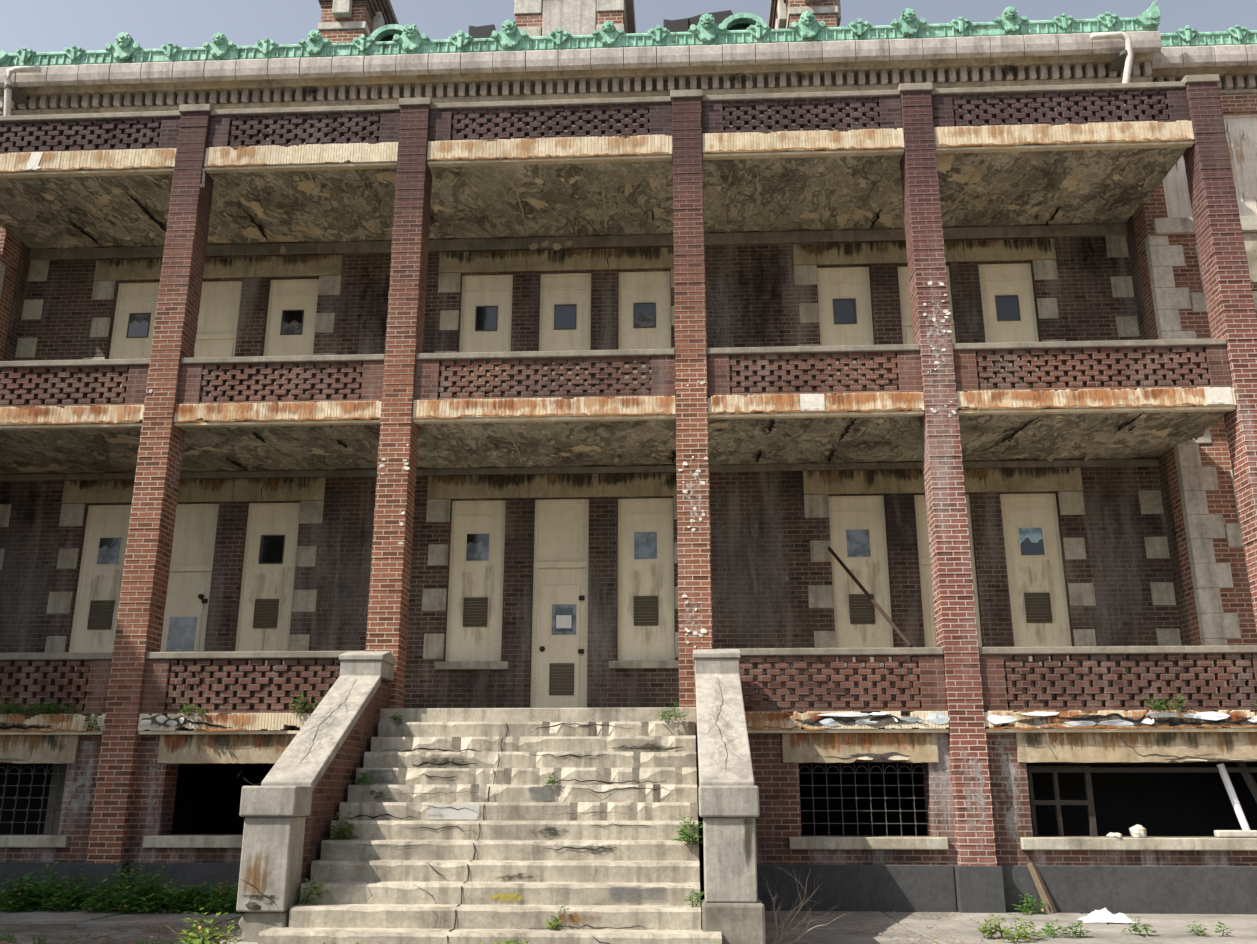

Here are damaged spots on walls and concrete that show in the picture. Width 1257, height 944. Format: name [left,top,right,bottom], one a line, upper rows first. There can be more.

rust [432,136,669,160]
crack [124,190,167,232]
damp [447,247,673,263]
rust [0,405,140,425]
rust [418,396,674,419]
rust [961,387,1205,410]
spalling [0,722,53,730]
spalling [139,714,232,728]
spalling [795,711,950,727]
spalling [986,711,1257,727]
crack [530,723,681,878]
crack [344,748,490,927]